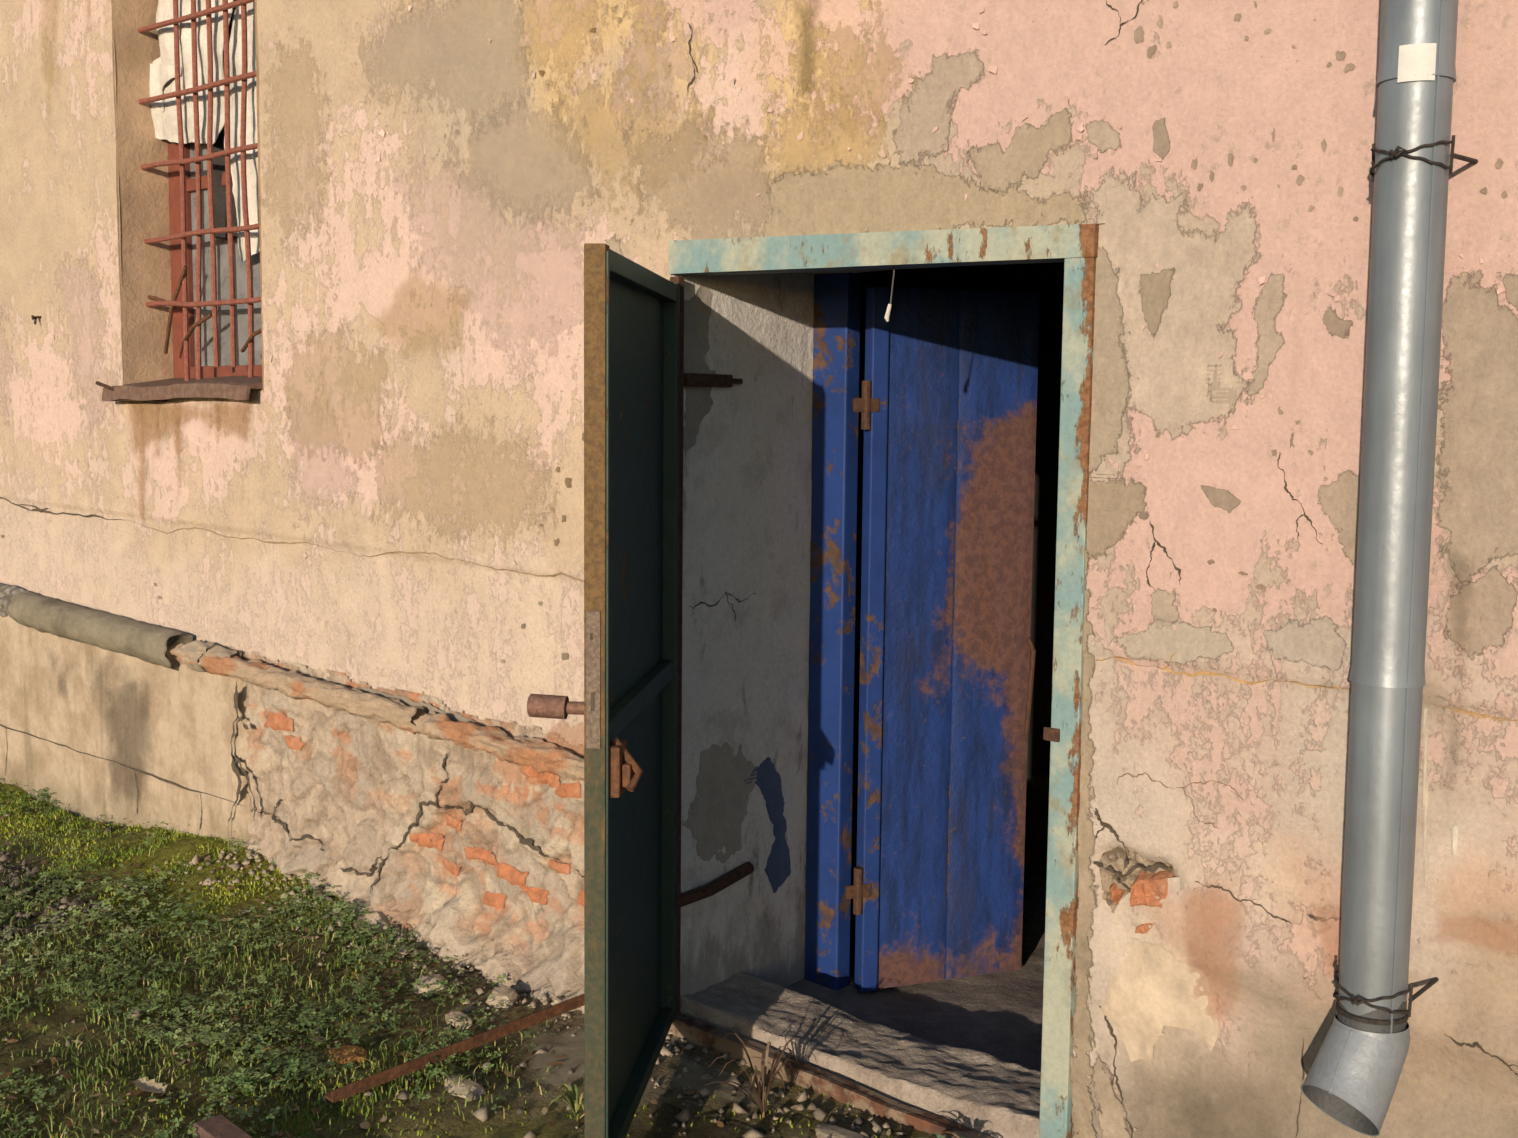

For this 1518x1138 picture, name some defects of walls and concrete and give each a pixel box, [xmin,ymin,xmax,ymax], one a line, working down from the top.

crack [1105,0,1143,45]
peeling [606,235,623,256]
crack [0,497,584,582]
peeling [756,1,1313,1138]
crack [1146,523,1181,592]
crack [1277,452,1322,544]
peeling [1431,254,1518,665]
crack [0,682,584,893]
spalling [170,640,584,1014]
peeling [682,742,757,864]
crack [1093,772,1341,924]
crack [1445,1035,1518,1076]